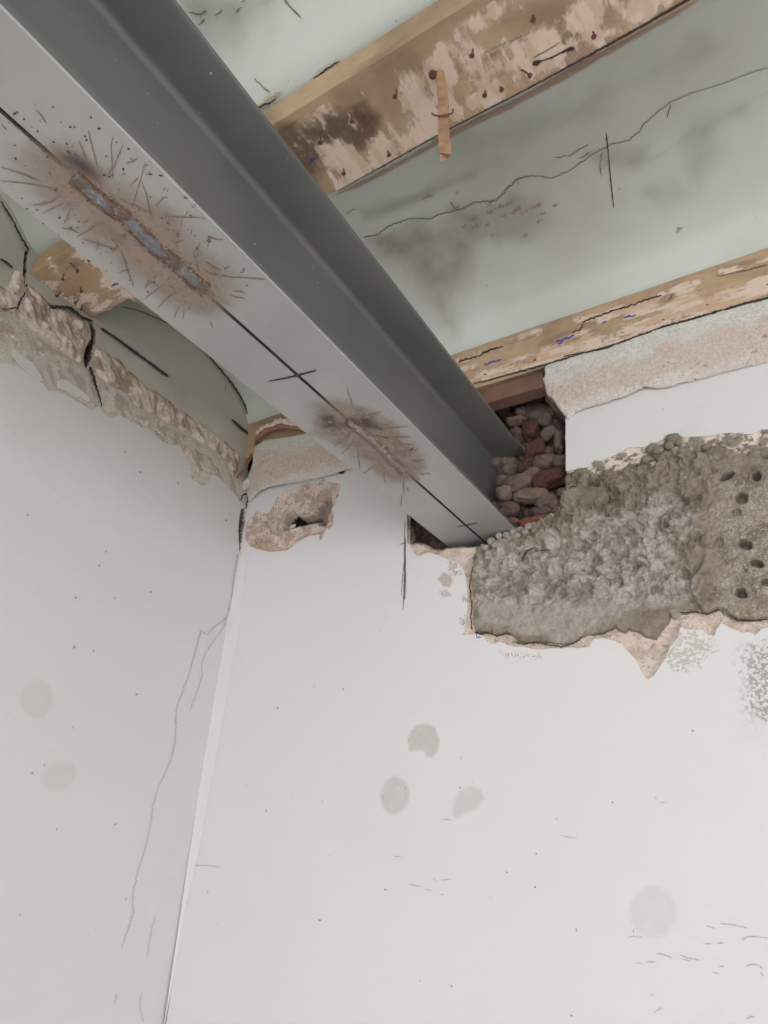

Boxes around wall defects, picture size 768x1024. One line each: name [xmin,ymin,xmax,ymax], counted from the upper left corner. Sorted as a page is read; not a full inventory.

crack [363,68,768,238]
flaking render [0,250,250,500]
flaking render [246,478,341,552]
spalling [491,396,574,528]
flaking render [407,515,768,679]
peeling [455,257,768,383]
flaking render [587,432,768,474]
crack [121,461,253,957]